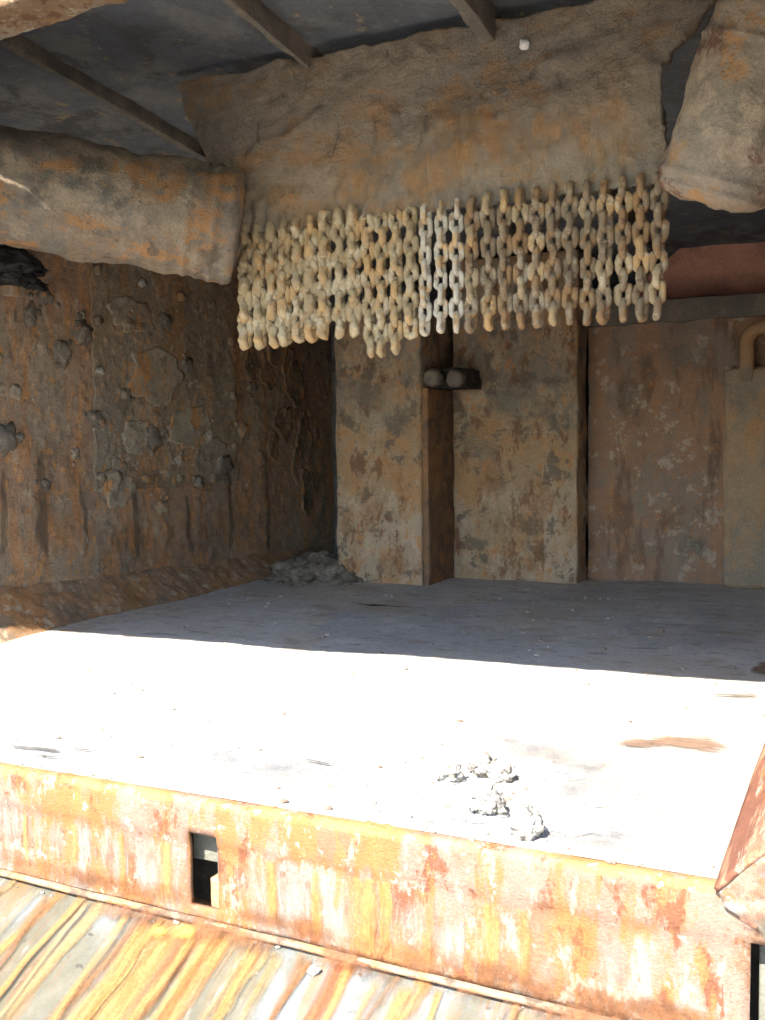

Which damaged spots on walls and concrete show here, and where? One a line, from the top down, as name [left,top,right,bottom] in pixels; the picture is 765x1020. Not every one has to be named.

rust [243,333,314,517]
rust [0,835,284,1020]
rust [269,959,309,1020]
rust [298,872,368,1020]
rust [353,879,392,951]
rust [356,980,442,1020]
rust [472,904,544,994]
rust [548,990,698,1020]